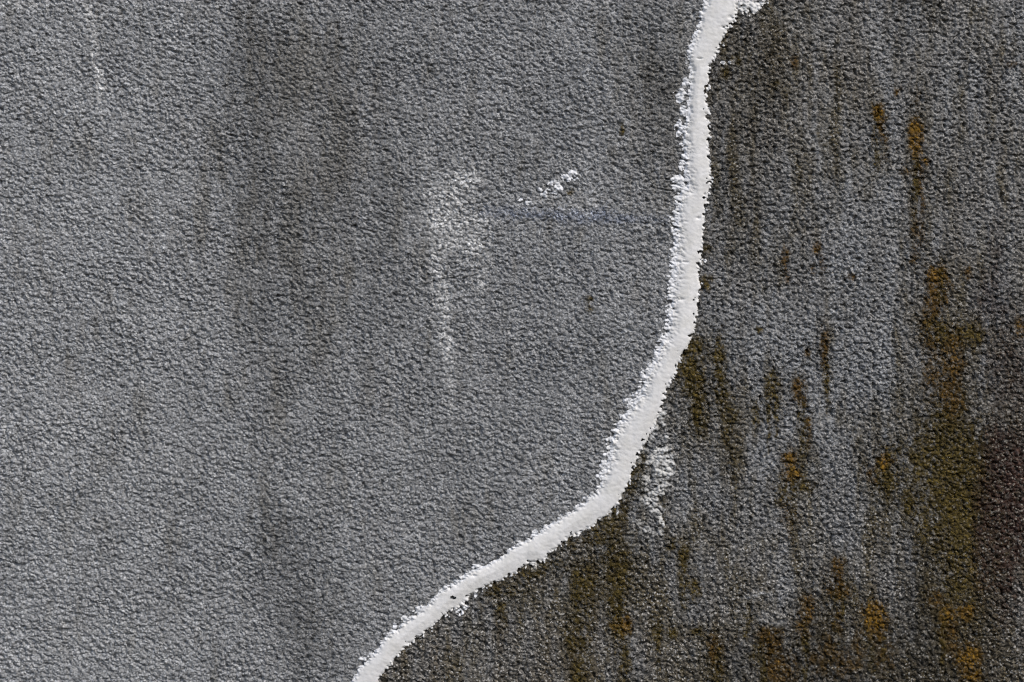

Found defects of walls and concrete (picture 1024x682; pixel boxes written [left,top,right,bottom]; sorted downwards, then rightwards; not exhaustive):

corrosion [872,103,887,165]
corrosion [900,117,928,243]
crack [351,0,769,682]
corrosion [805,331,832,414]
corrosion [920,266,984,419]
corrosion [776,378,815,518]
corrosion [867,444,913,515]
corrosion [830,602,894,676]
corrosion [930,579,983,682]